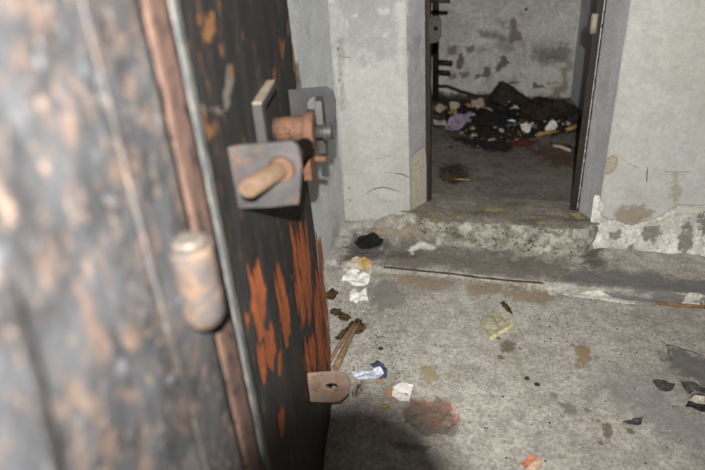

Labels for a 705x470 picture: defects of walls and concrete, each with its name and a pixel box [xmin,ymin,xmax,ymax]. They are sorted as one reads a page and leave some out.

water stain [509,18,522,43]
water stain [532,47,572,68]
water stain [616,206,654,223]
spalling [570,195,705,256]
water stain [382,237,705,305]